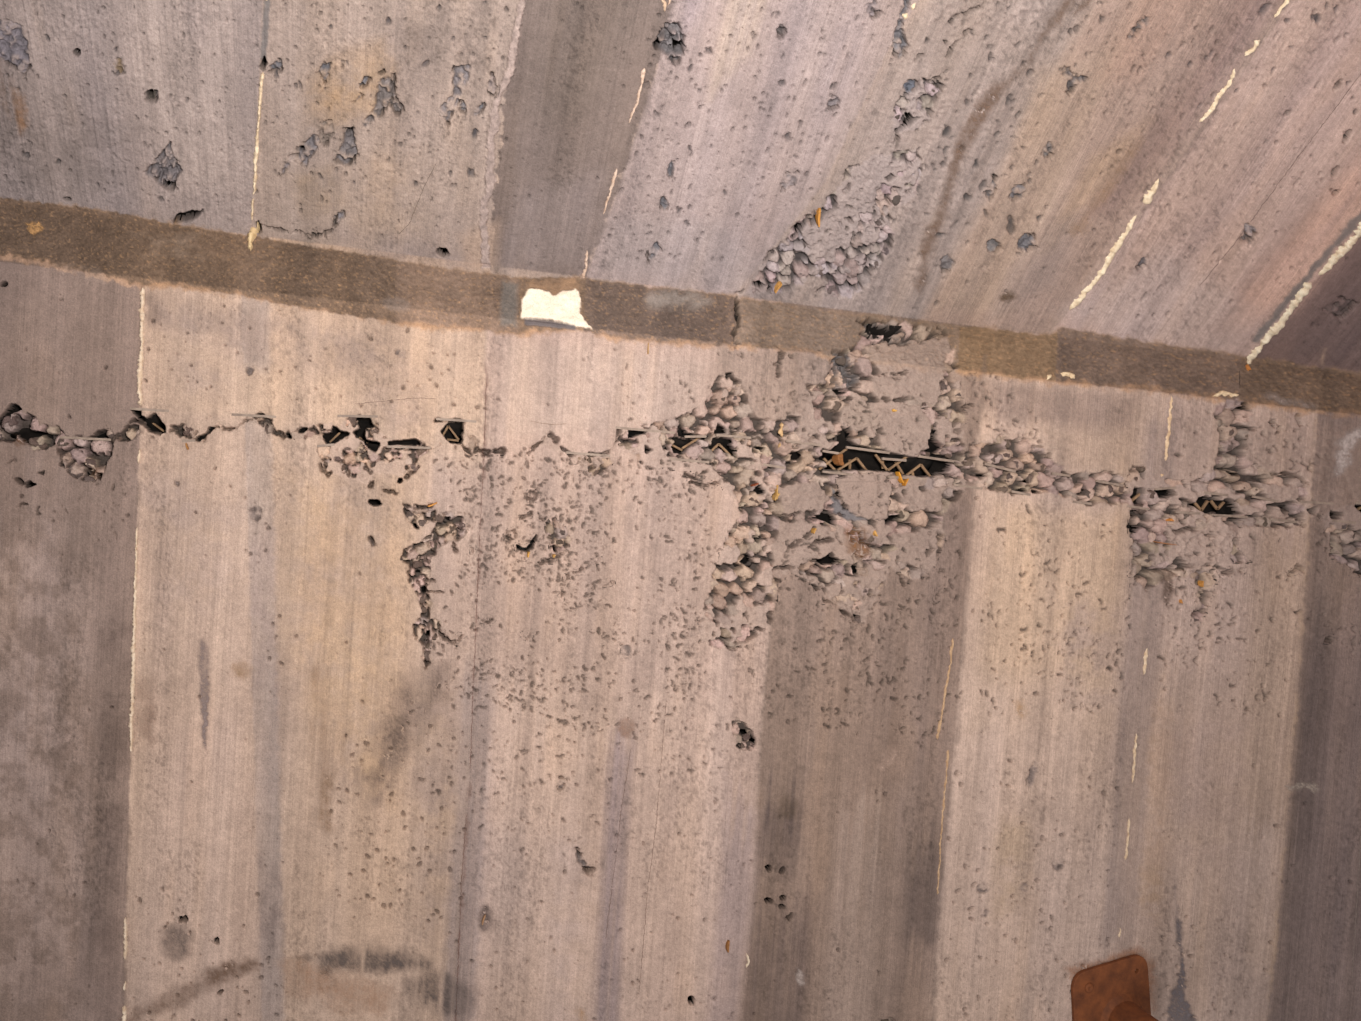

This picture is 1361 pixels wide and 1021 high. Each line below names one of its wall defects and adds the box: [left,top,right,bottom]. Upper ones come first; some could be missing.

spalling [778,168,801,195]
crack [1199,74,1361,286]
crack [112,406,330,444]
spalling [857,315,951,361]
peeling [1247,282,1312,364]
crack [356,385,623,763]
hole [430,451,734,743]
spalling [735,495,1134,749]
spalling [1158,527,1307,715]